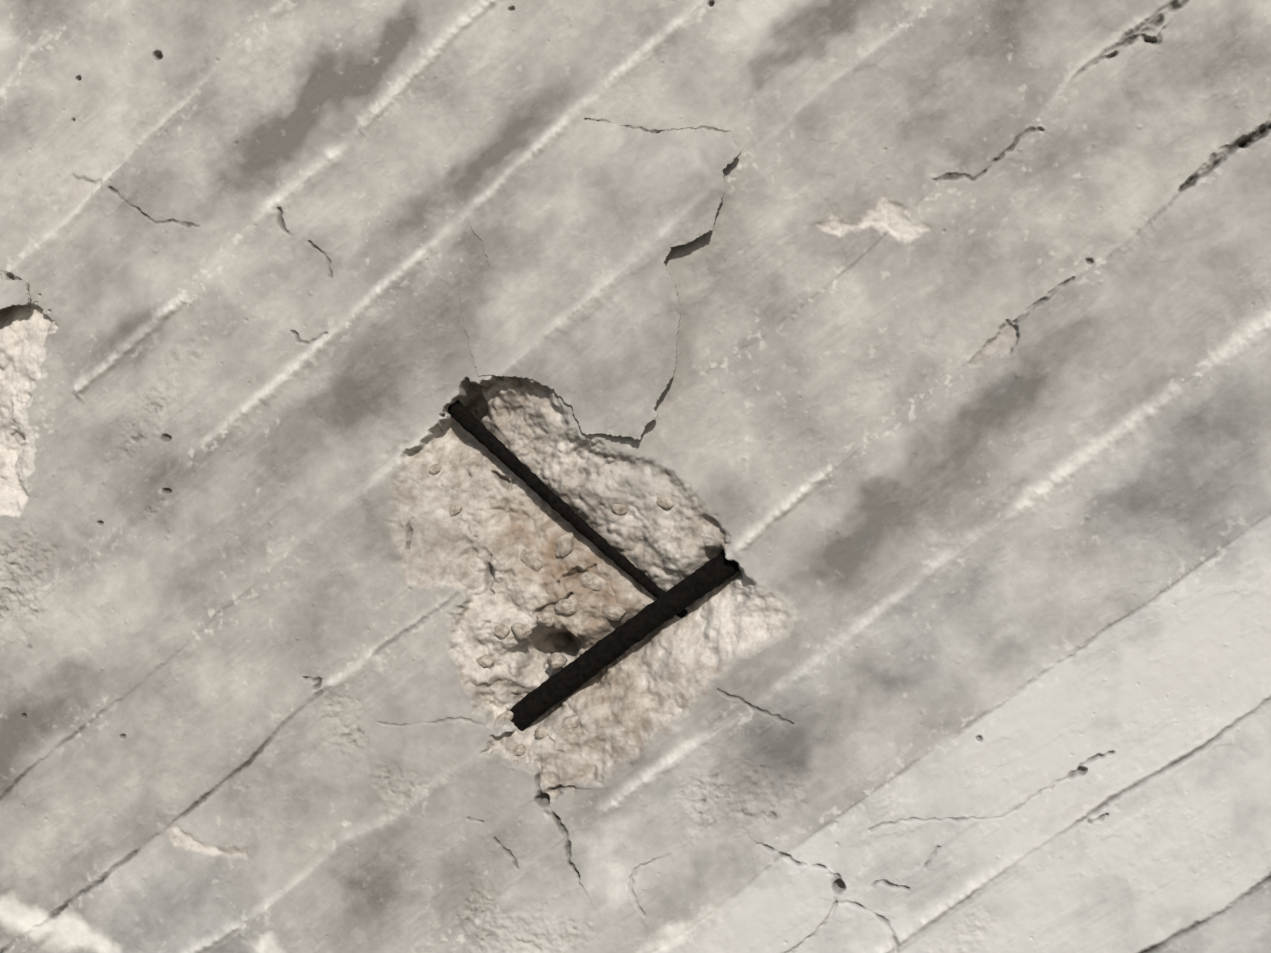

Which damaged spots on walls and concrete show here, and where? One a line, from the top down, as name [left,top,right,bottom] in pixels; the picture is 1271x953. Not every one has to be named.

crack [1094,0,1192,68]
crack [931,126,1046,184]
crack [1178,114,1271,195]
crack [107,186,203,230]
crack [0,268,22,281]
crack [1013,276,1077,326]
spalling [0,273,61,523]
spalling [382,119,801,804]
rust [476,484,652,655]
crack [716,688,795,727]
crack [534,766,581,882]
crack [757,749,1117,953]